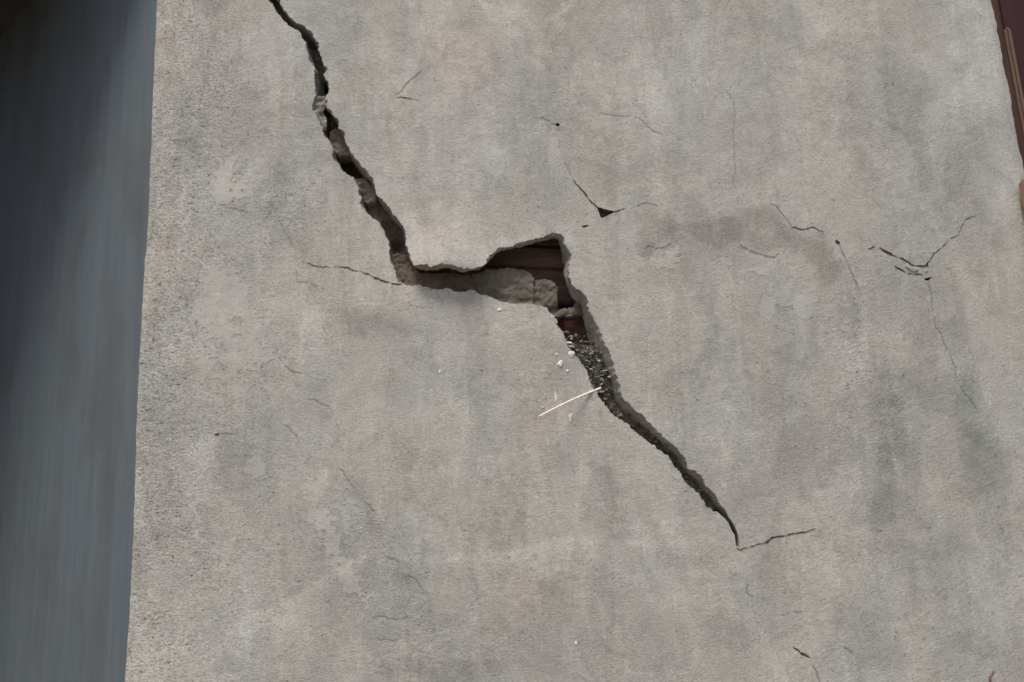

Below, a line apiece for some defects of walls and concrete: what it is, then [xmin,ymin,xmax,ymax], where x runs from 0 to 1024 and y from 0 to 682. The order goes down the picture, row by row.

crack [268,0,816,550]
crack [772,204,977,409]